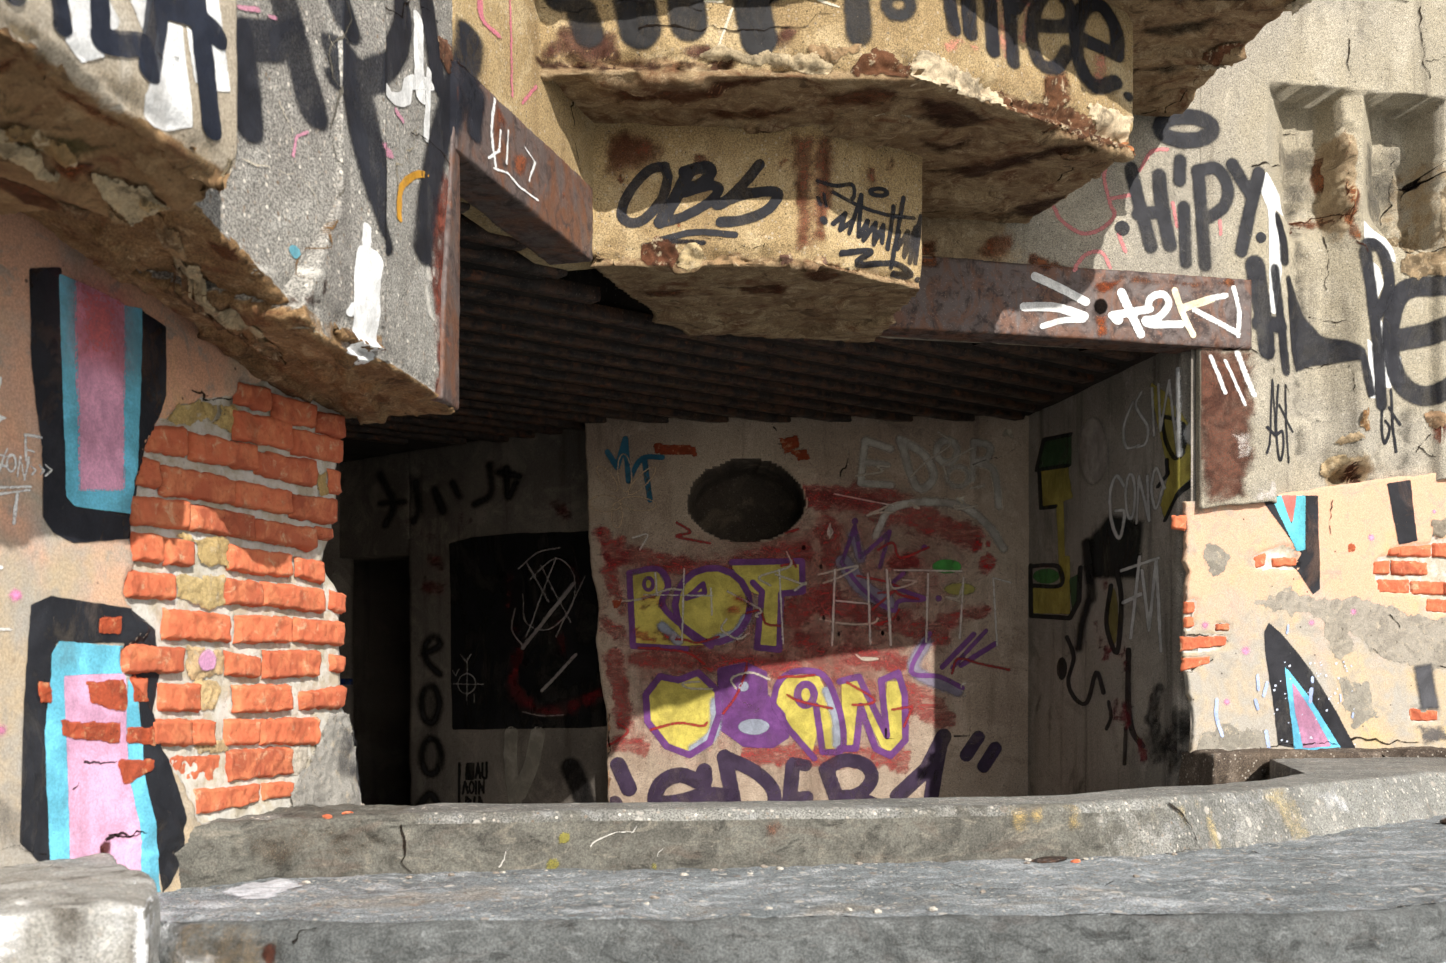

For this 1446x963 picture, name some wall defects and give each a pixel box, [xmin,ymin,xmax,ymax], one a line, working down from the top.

spalling [0,123,287,366]
corrosion [432,176,448,386]
corrosion [607,130,662,183]
corrosion [780,135,833,250]
spalling [700,43,1135,155]
corrosion [922,241,937,267]
corrosion [1096,281,1117,292]
corrosion [1201,344,1254,502]
flaking render [120,382,347,814]
flaking render [1180,601,1229,671]
flaking render [1253,518,1446,670]
flaking render [1197,723,1270,751]